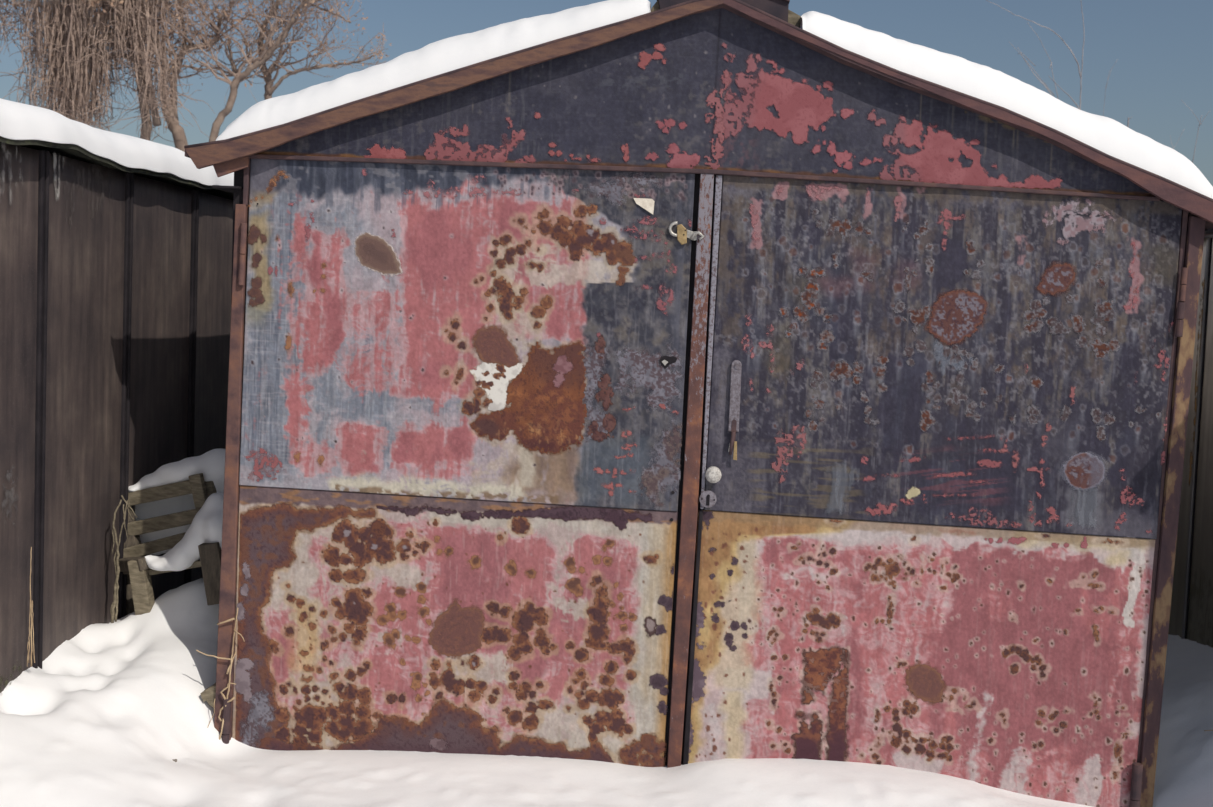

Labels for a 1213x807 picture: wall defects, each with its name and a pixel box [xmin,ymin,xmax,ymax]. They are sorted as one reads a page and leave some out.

peeling [638,43,666,69]
peeling [362,144,406,176]
peeling [404,117,598,199]
peeling [645,43,1062,222]
peeling [1042,198,1113,245]
corrosion [445,204,636,454]
peeling [470,362,523,411]
corrosion [865,556,960,624]
corrosion [235,503,673,767]
corrosion [711,600,748,651]
corrosion [767,607,954,765]
corrosion [1002,639,1046,677]